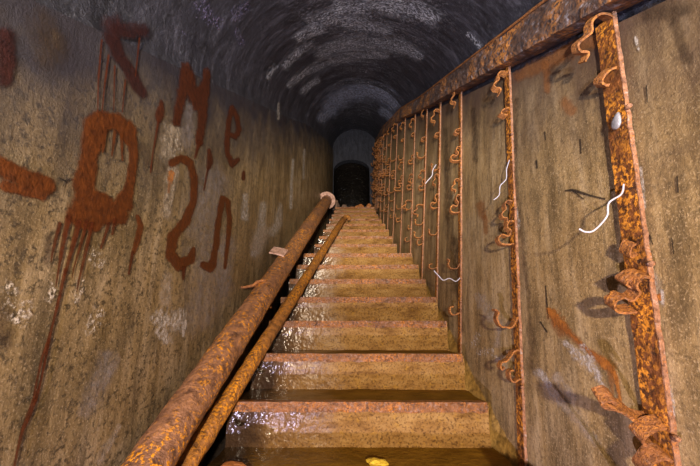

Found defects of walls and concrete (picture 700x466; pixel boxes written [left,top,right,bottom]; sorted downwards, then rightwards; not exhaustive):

leakage [5,283,33,324]
leakage [152,277,187,344]
rust [547,307,622,402]